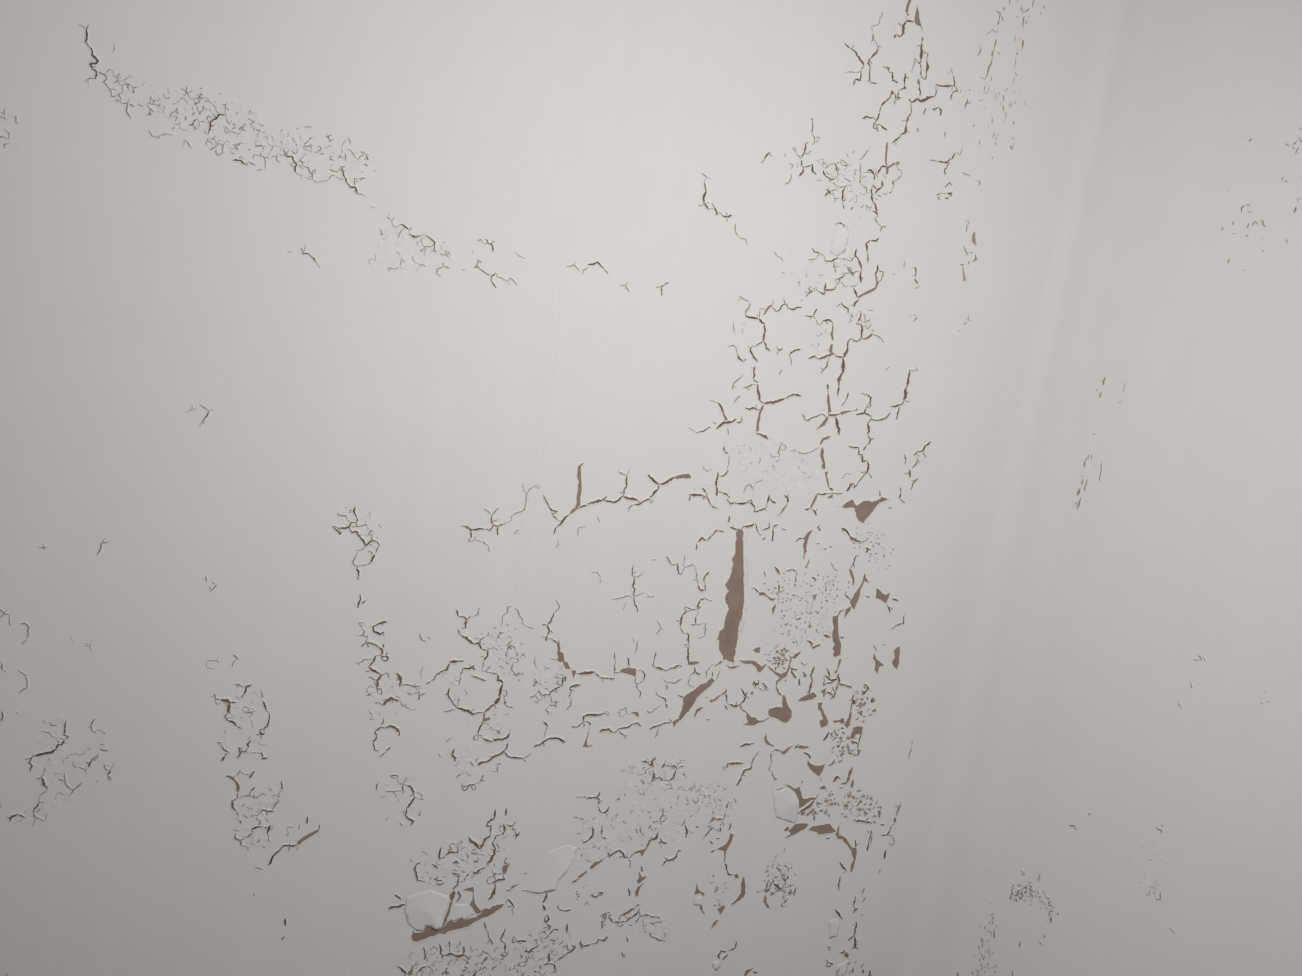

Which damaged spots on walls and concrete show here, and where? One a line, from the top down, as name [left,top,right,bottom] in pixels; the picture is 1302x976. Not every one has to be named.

crack [78,23,525,289]
crack [687,12,981,495]
crack [0,564,116,825]
crack [205,653,285,851]
crack [459,483,540,552]
crack [332,505,798,976]
peeling [542,436,906,873]
crack [751,521,895,671]
peeling [388,808,578,945]
peeling [627,866,648,898]
peeling [716,832,748,907]
crack [801,789,900,976]